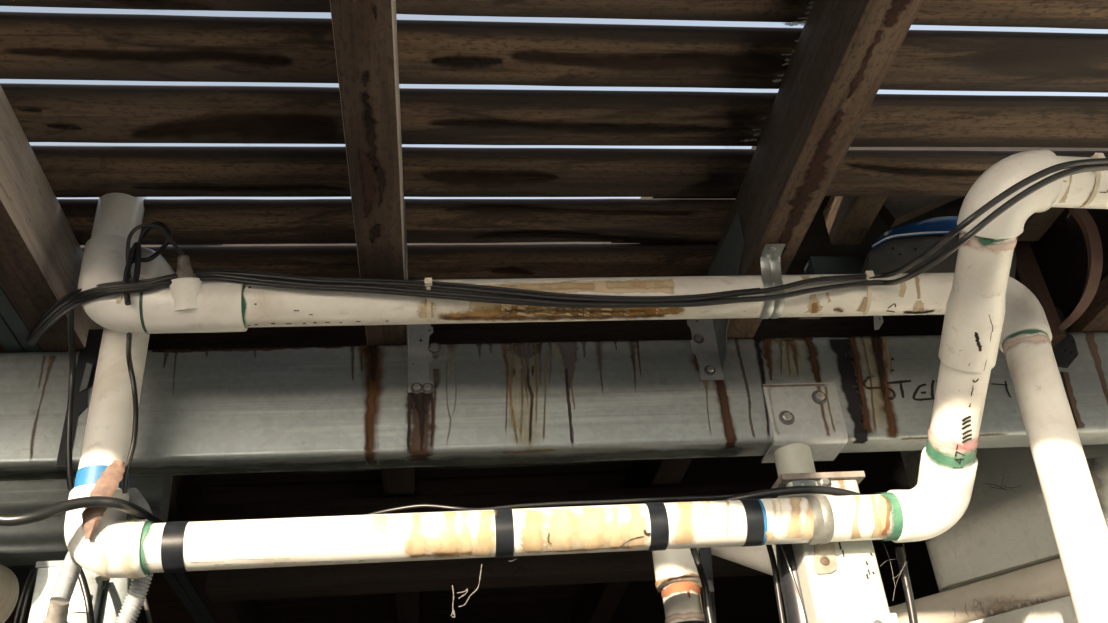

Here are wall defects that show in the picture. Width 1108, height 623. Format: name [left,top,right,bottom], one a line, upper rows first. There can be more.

leakage [849,165,984,177]
corrosion [152,345,383,464]
corrosion [406,344,457,461]
corrosion [693,354,736,448]
corrosion [849,336,927,440]